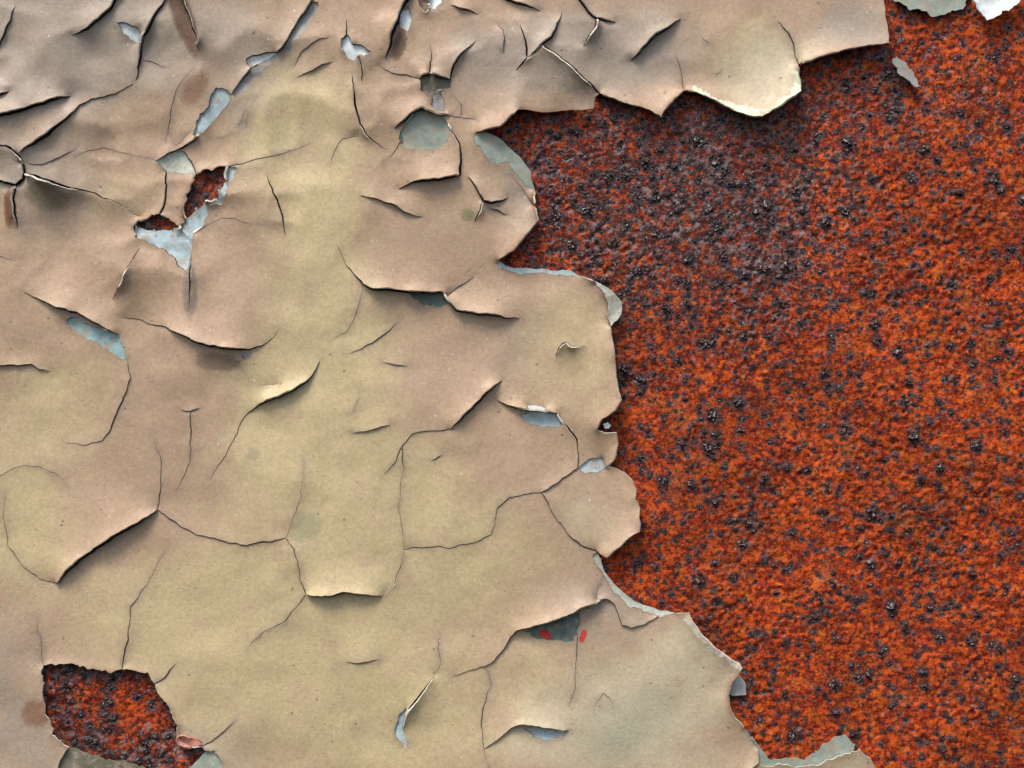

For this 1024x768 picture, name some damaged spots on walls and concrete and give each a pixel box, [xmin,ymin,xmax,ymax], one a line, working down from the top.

peeling [399,75,451,150]
corrosion [129,162,228,244]
peeling [134,167,237,271]
peeling [67,317,127,360]
crack [0,0,725,768]
peeling [474,0,1021,696]
corrosion [475,0,1024,768]
peeling [59,747,146,768]
corrosion [37,659,208,768]
peeling [176,734,222,768]
peeling [524,726,565,741]
peeling [745,729,855,767]